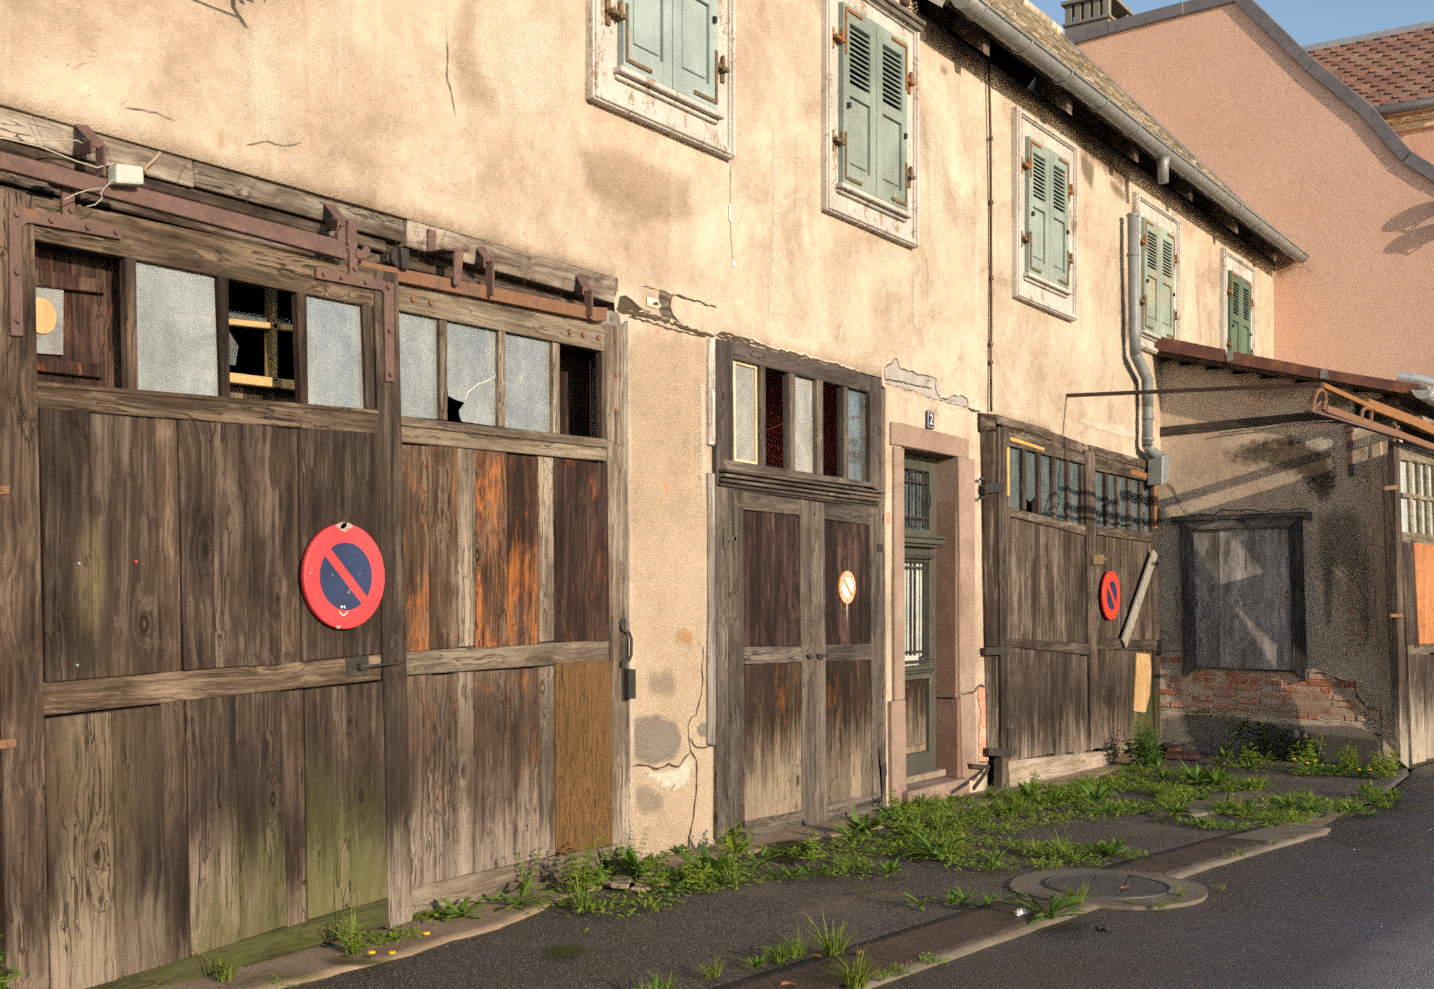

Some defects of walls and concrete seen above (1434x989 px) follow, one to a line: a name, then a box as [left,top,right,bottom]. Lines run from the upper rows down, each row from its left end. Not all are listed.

flaking render [614,284,683,335]
flaking render [882,353,969,411]
damp [1234,433,1356,615]
flaking render [1159,647,1382,725]
crack [632,643,714,849]